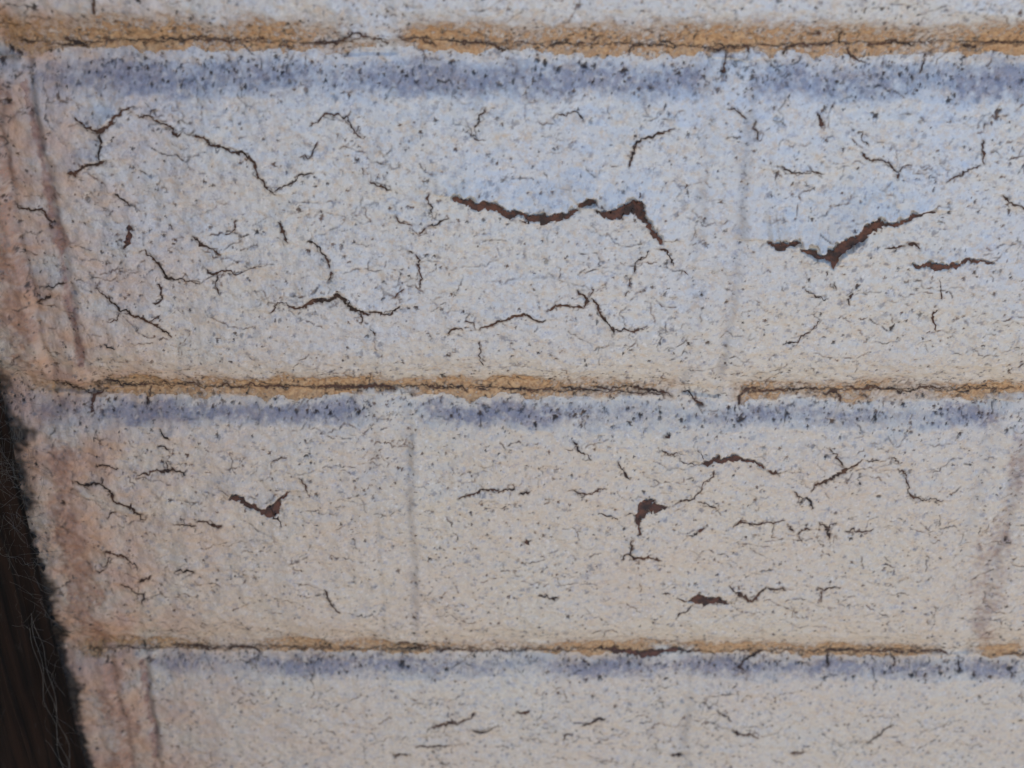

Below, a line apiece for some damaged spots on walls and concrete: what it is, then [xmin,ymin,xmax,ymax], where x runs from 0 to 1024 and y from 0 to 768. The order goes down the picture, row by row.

crack [67,107,364,193]
crack [95,220,254,350]
crack [271,194,447,335]
crack [887,241,920,249]
crack [55,289,703,412]
crack [75,430,185,520]
peeling [600,499,667,536]
crack [680,472,716,508]
crack [733,449,941,541]
crack [97,551,194,604]
crack [730,587,786,603]